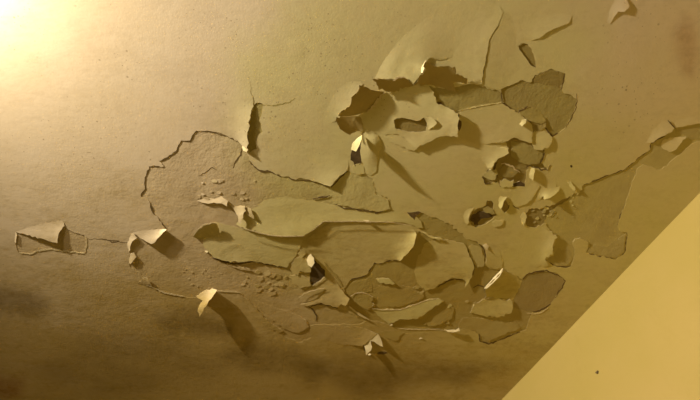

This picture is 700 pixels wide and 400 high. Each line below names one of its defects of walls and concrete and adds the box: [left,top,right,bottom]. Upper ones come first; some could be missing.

peeling [607,0,629,24]
flaking render [127,43,700,355]
peeling [15,220,87,255]